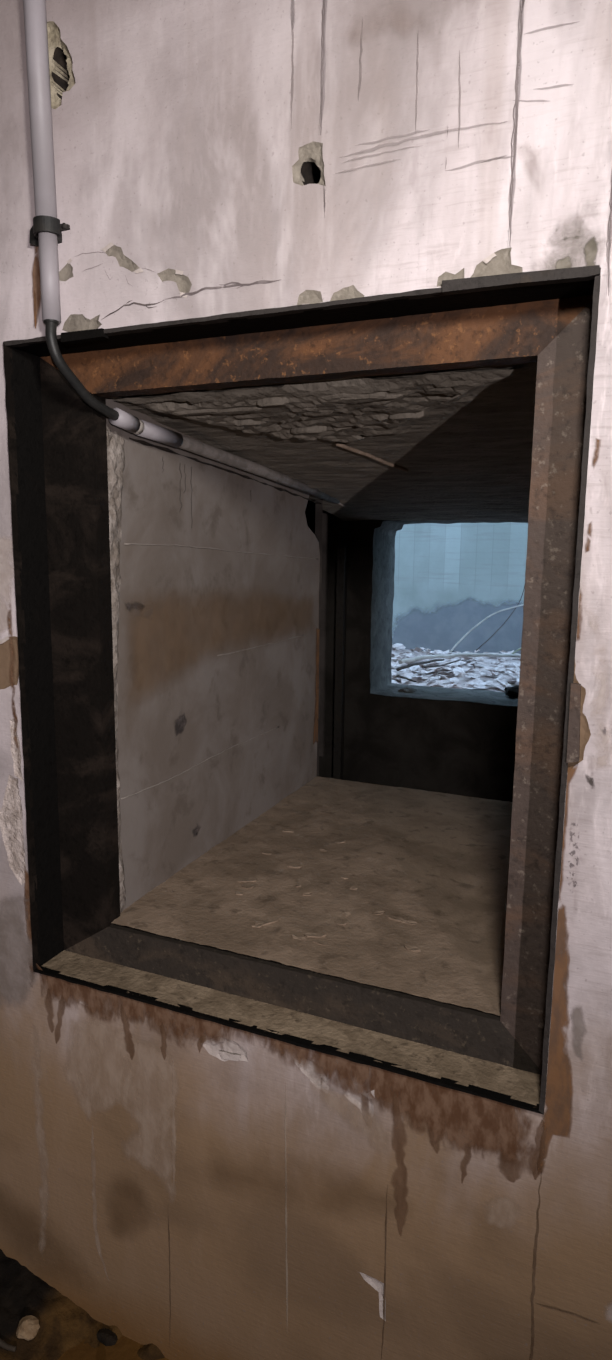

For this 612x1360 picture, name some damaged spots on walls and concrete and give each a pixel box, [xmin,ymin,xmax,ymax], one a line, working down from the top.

spalling [47,21,76,109]
spalling [292,141,325,186]
peeling [59,258,74,281]
peeling [101,242,192,298]
spalling [437,247,523,287]
crack [103,280,279,319]
spalling [62,314,102,332]
peeling [0,636,19,689]
corrosion [24,767,577,1236]